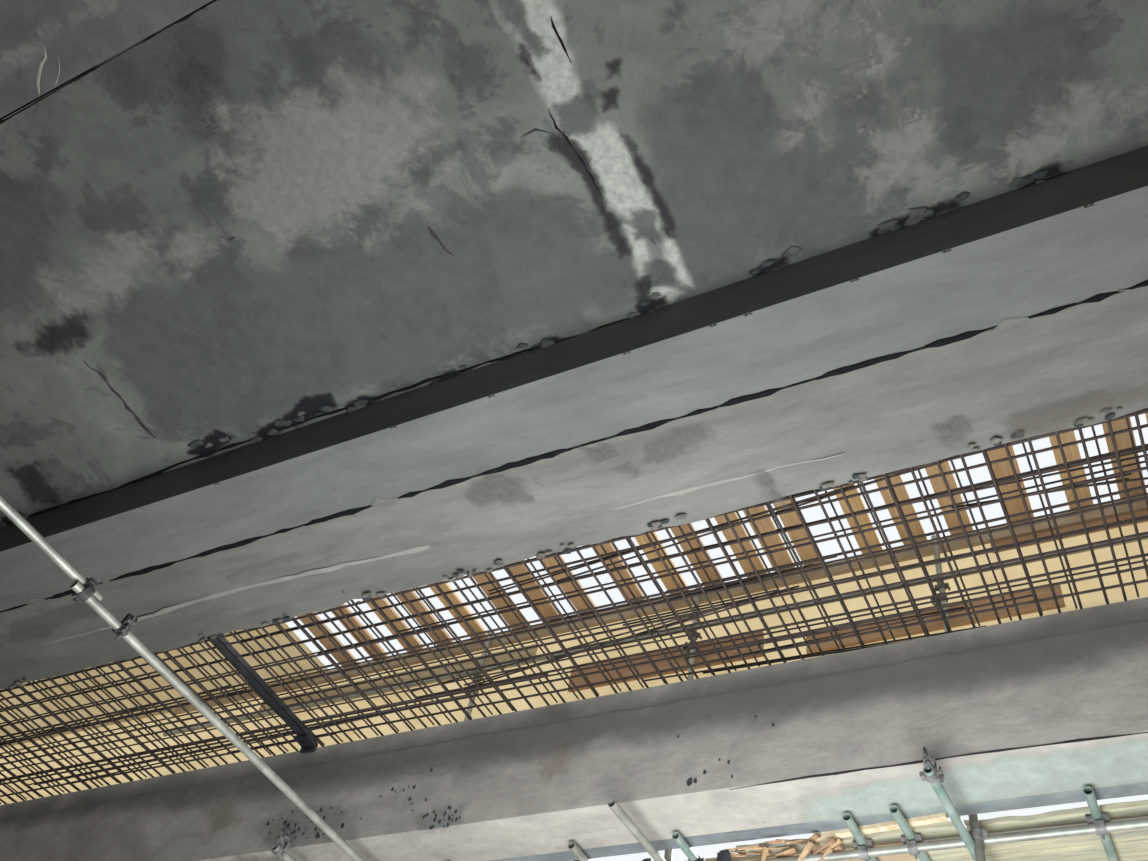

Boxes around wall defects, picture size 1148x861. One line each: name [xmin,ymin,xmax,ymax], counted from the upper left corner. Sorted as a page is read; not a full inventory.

water stain [99,0,891,430]
spalling [871,192,970,238]
spalling [253,394,379,442]
spalling [187,431,232,457]
crack [7,280,1148,611]
spalling [0,512,29,527]
spalling [647,514,687,530]
spalling [443,560,504,582]
spalling [536,544,574,559]
spalling [380,780,461,829]